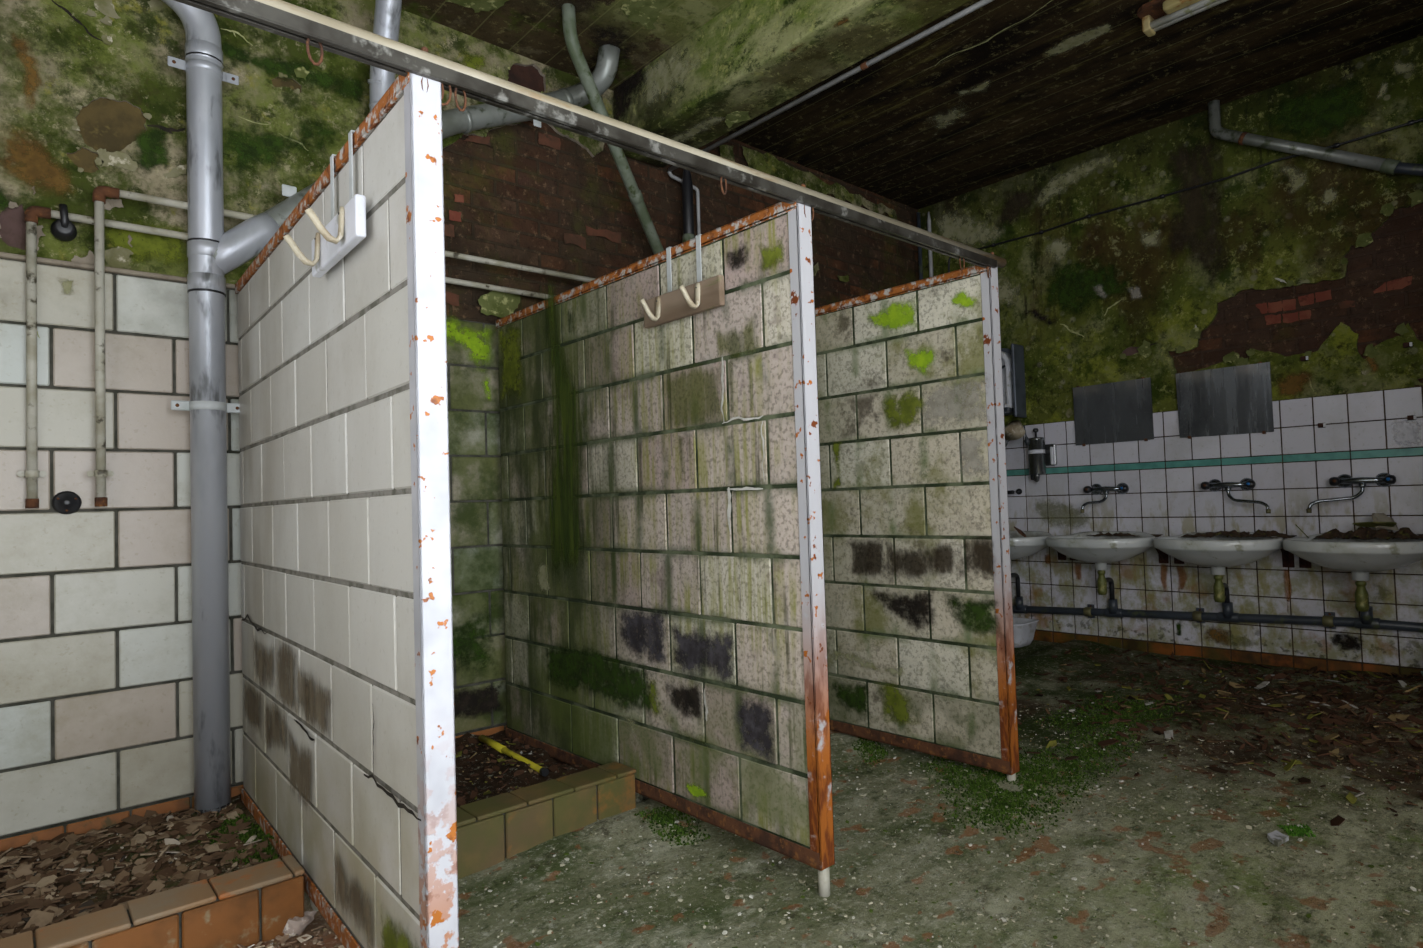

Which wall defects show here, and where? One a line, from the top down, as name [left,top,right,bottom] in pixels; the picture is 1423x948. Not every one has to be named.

spalling [67,93,152,173]
leakage [591,28,644,121]
peeling [725,111,751,128]
leakage [936,81,989,128]
leakage [1045,25,1110,56]
peeling [104,199,123,211]
peeling [720,145,897,220]
peeling [478,291,520,318]
spalling [1169,190,1423,374]
leakage [852,539,993,628]
leakage [621,611,734,721]
leakage [737,700,774,761]